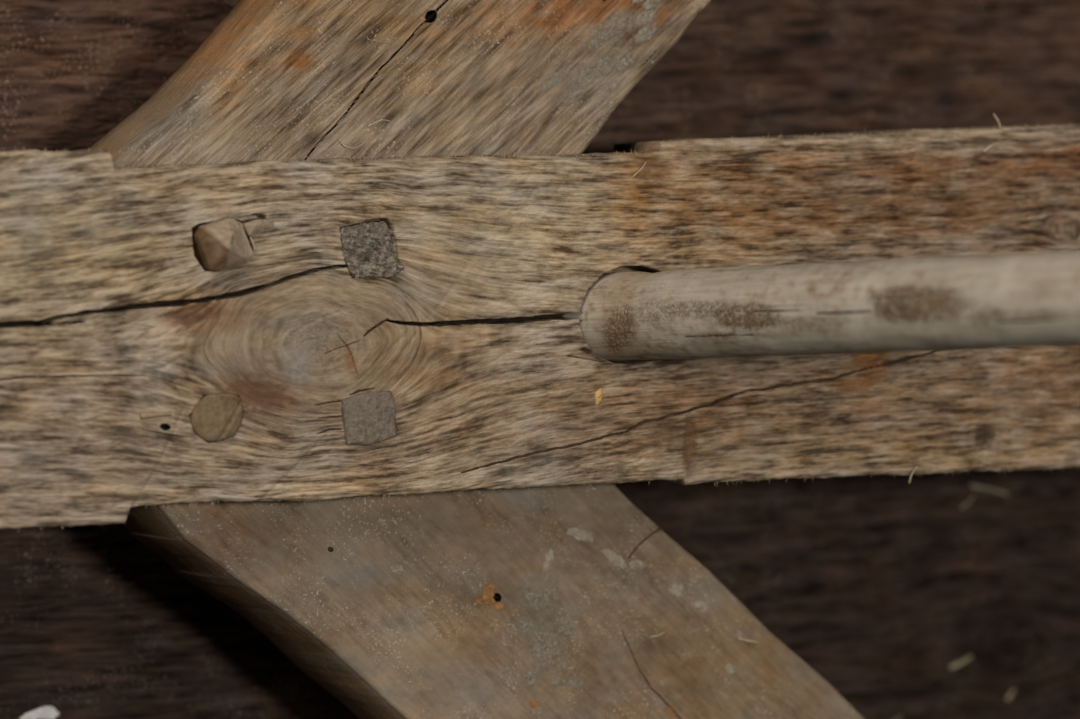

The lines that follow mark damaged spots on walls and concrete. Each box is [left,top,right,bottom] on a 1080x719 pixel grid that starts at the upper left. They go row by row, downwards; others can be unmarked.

crack [304,0,448,160]
crack [0,265,347,329]
crack [685,310,791,337]
crack [817,293,959,314]
crack [461,350,943,473]
crack [622,631,682,719]